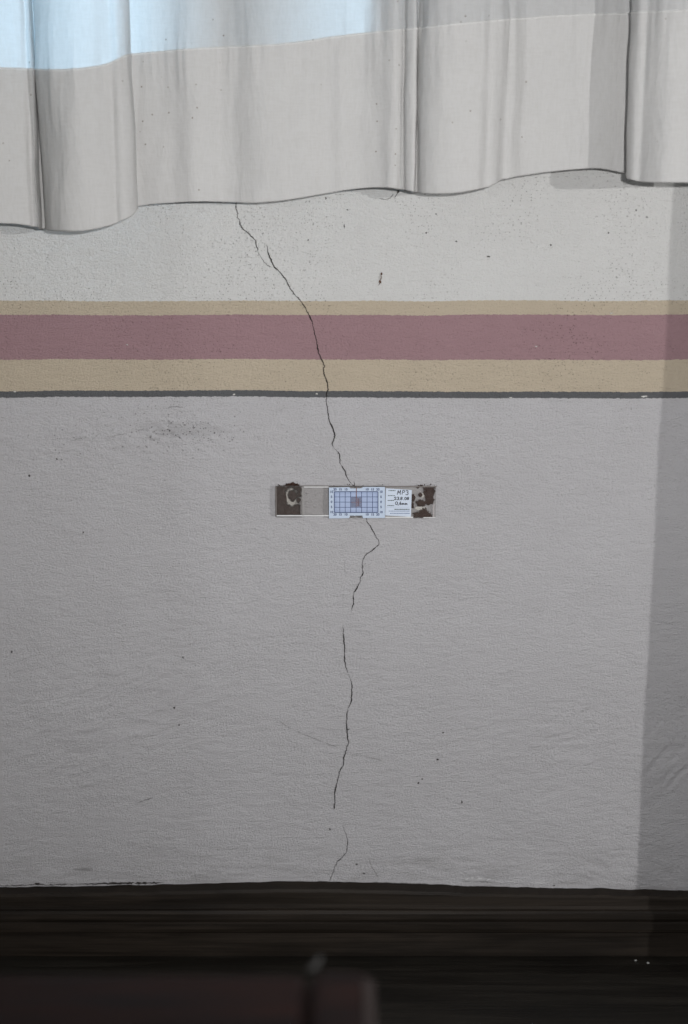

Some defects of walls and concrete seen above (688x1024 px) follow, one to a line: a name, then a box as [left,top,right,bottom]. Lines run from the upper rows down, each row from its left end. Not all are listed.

crack [235,206,355,486]
crack [330,518,381,879]